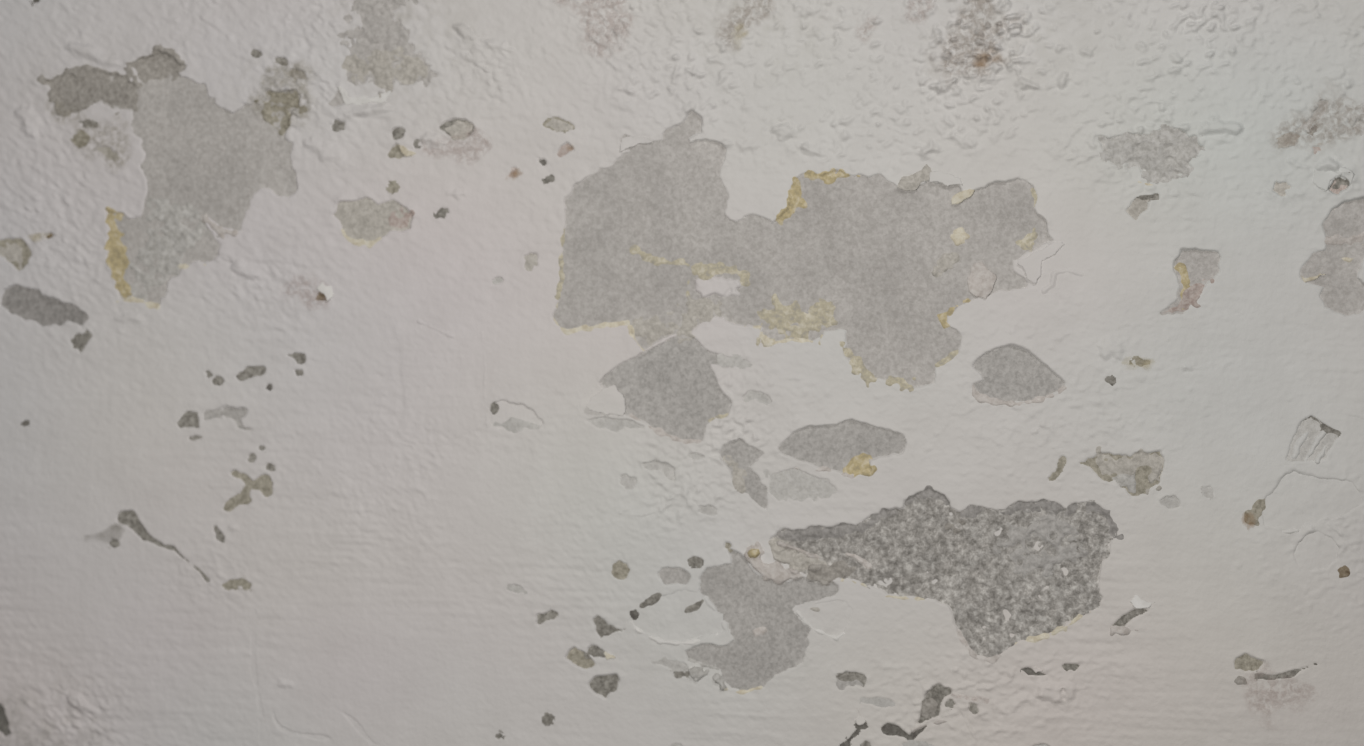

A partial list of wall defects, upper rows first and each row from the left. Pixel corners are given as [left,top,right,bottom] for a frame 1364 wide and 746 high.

peeling [37,44,308,310]
peeling [334,181,415,248]
peeling [539,116,575,184]
peeling [1276,100,1364,316]
peeling [0,238,92,352]
peeling [553,112,1067,509]
peeling [1160,250,1220,315]
peeling [206,366,272,391]
peeling [177,407,252,441]
peeling [223,445,275,512]
peeling [1049,446,1180,509]
peeling [567,485,1124,698]